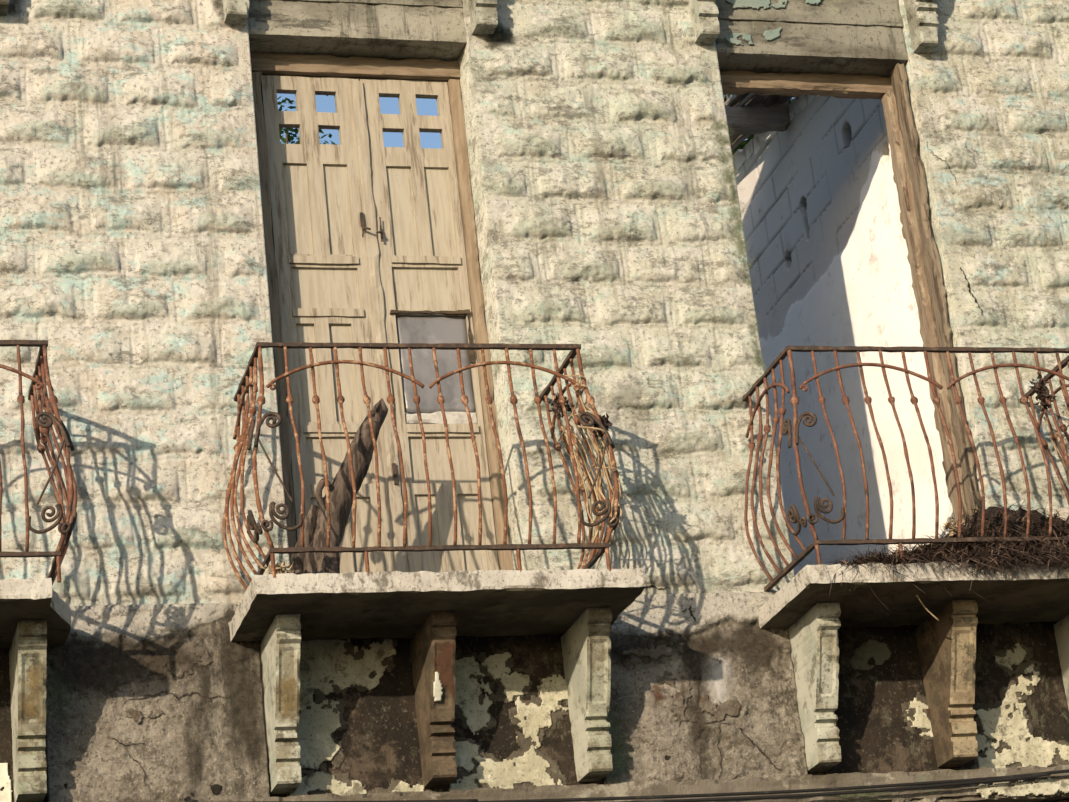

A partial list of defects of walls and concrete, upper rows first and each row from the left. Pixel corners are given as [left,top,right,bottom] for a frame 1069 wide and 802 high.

peeling [725,0,788,10]
peeling [724,27,782,46]
crack [960,267,983,312]
peeling [849,639,891,670]
peeling [286,638,431,797]
peeling [433,648,569,792]
crack [687,655,781,778]
peeling [901,692,934,740]
peeling [971,643,1069,799]
peeling [0,763,13,802]